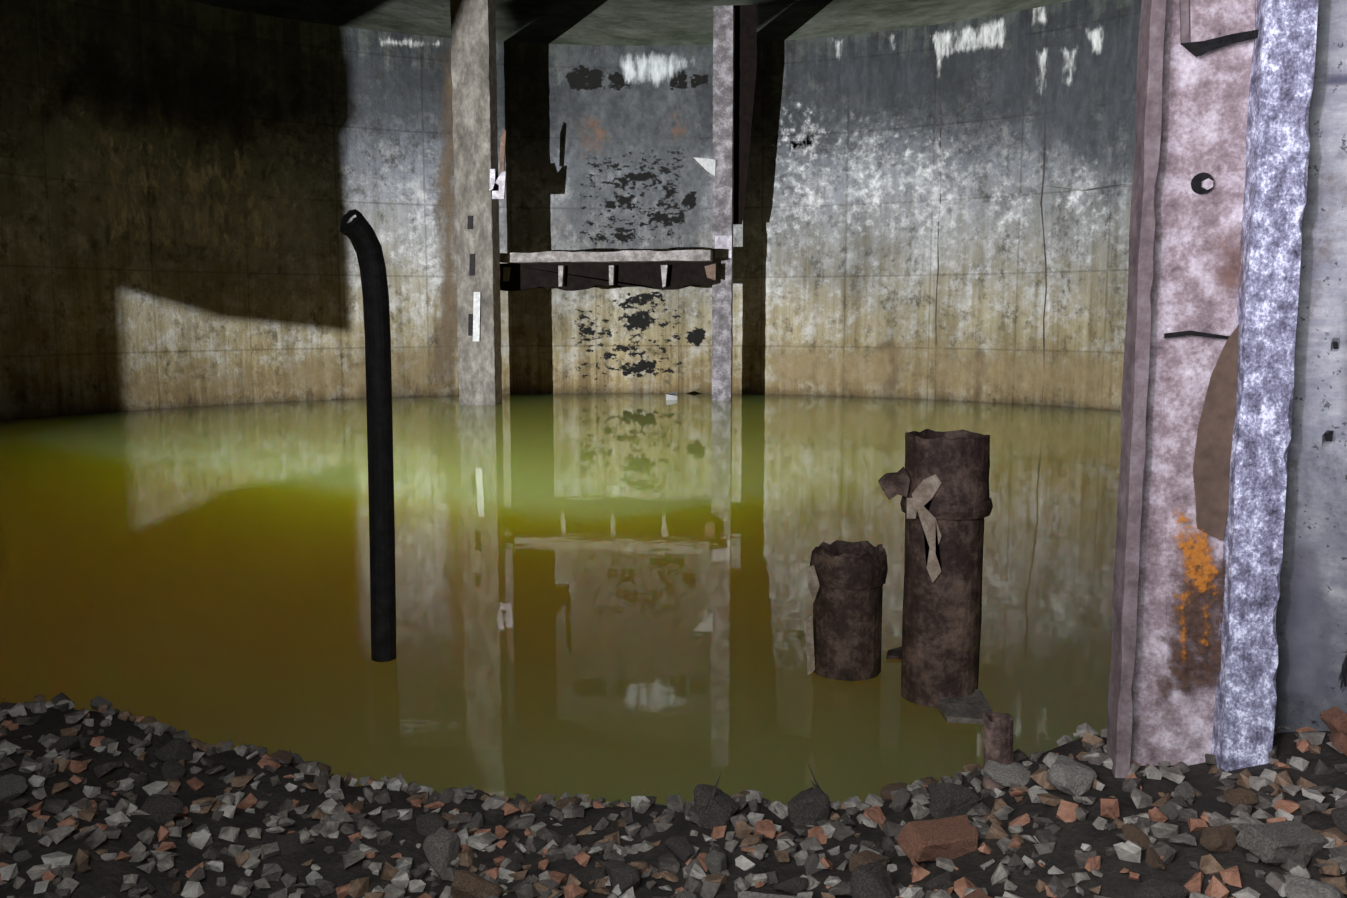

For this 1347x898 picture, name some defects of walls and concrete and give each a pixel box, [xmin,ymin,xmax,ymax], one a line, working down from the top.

damp [1015,8,1140,171]
spalling [580,147,696,246]
spalling [571,292,706,386]
rust [1157,513,1226,698]
crack [1339,663,1347,687]